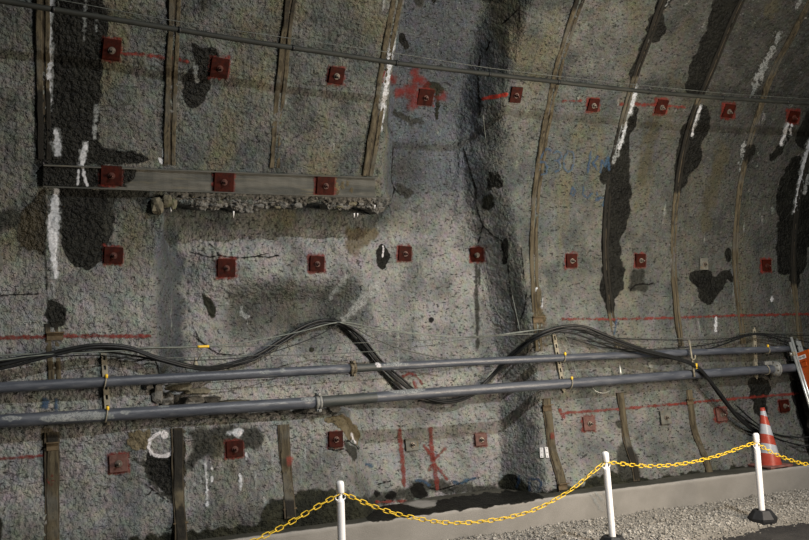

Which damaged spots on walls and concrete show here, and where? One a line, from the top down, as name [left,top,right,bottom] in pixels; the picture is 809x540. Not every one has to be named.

damp [0,0,164,327]
damp [182,43,219,108]
spalling [170,192,392,215]
crack [463,148,527,319]
damp [600,0,672,313]
damp [674,0,739,193]
damp [689,248,733,305]
damp [769,111,809,288]
damp [119,532,174,540]
damp [187,443,700,540]